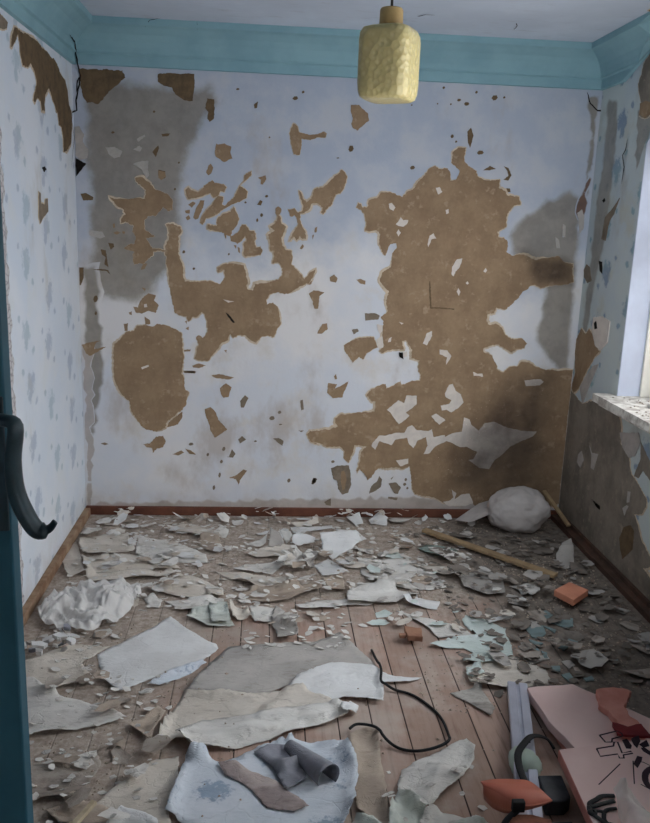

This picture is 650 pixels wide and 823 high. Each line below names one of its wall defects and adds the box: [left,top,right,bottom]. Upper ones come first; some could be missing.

crack [70,35,81,157]
flaking render [638,54,650,119]
leakage [633,105,650,184]
peeling [79,223,125,285]
peeling [185,200,205,220]
leakage [73,68,475,509]
leakage [501,94,621,369]
peeling [167,412,182,427]
peeling [212,374,234,398]
flaking render [559,390,650,600]